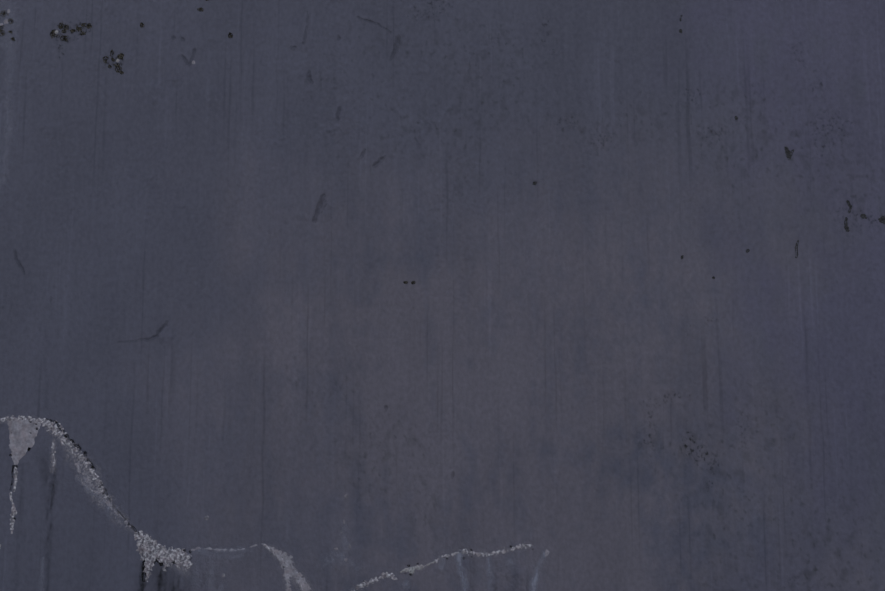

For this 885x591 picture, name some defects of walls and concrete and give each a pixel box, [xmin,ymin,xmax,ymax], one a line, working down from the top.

crack [0,415,139,533]
crack [191,543,263,551]
crack [351,543,534,591]